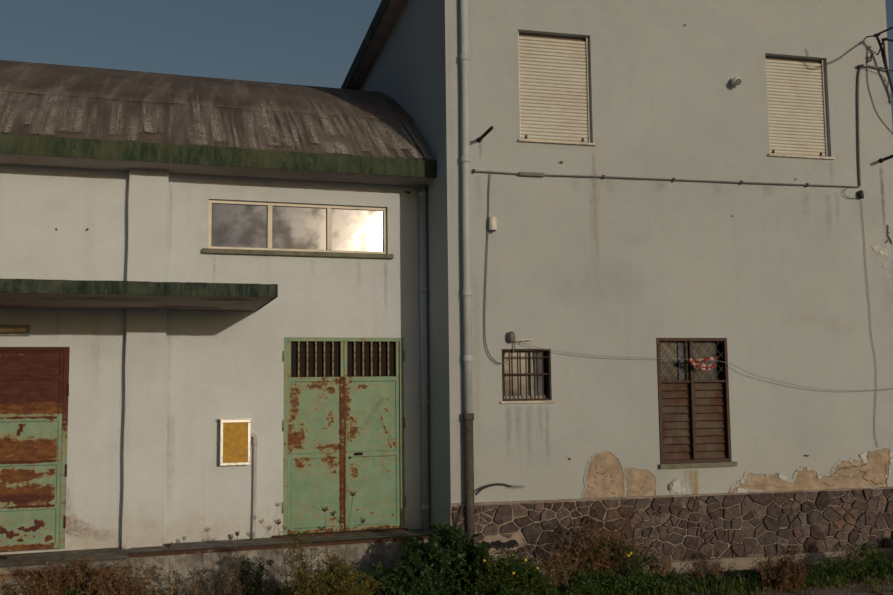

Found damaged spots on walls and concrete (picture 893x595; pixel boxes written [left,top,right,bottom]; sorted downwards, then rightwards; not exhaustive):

flaking render [582,449,658,499]
flaking render [668,478,691,494]
flaking render [729,446,893,493]